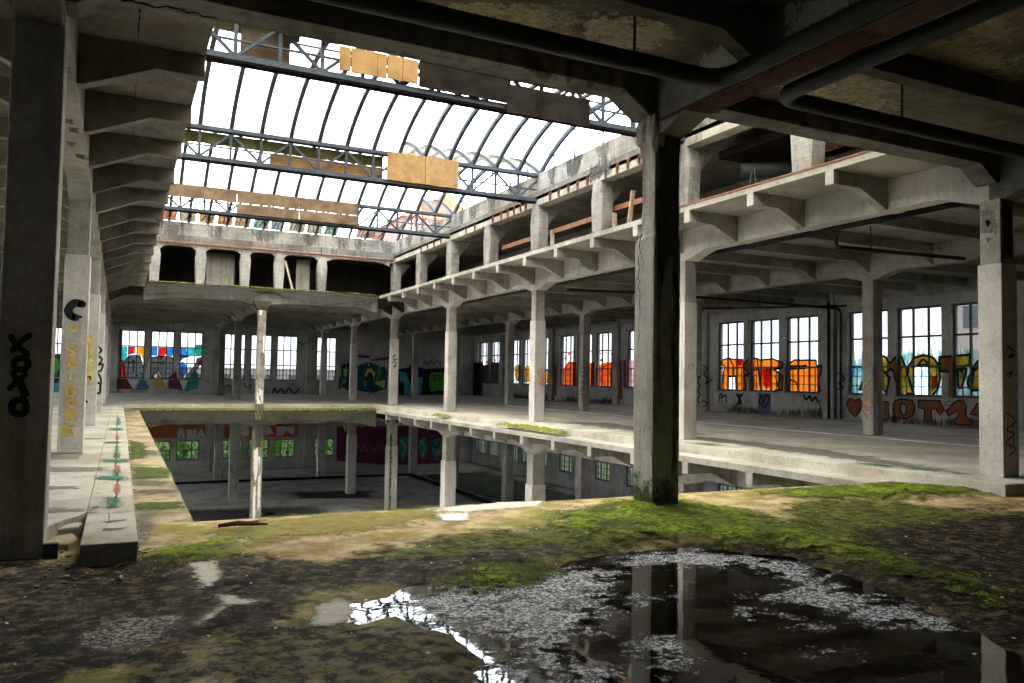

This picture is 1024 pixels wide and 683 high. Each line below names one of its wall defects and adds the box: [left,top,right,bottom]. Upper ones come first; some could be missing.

crack [121,0,218,42]
corrosion [549,175,589,200]
corrosion [604,154,641,179]
crack [635,234,644,357]